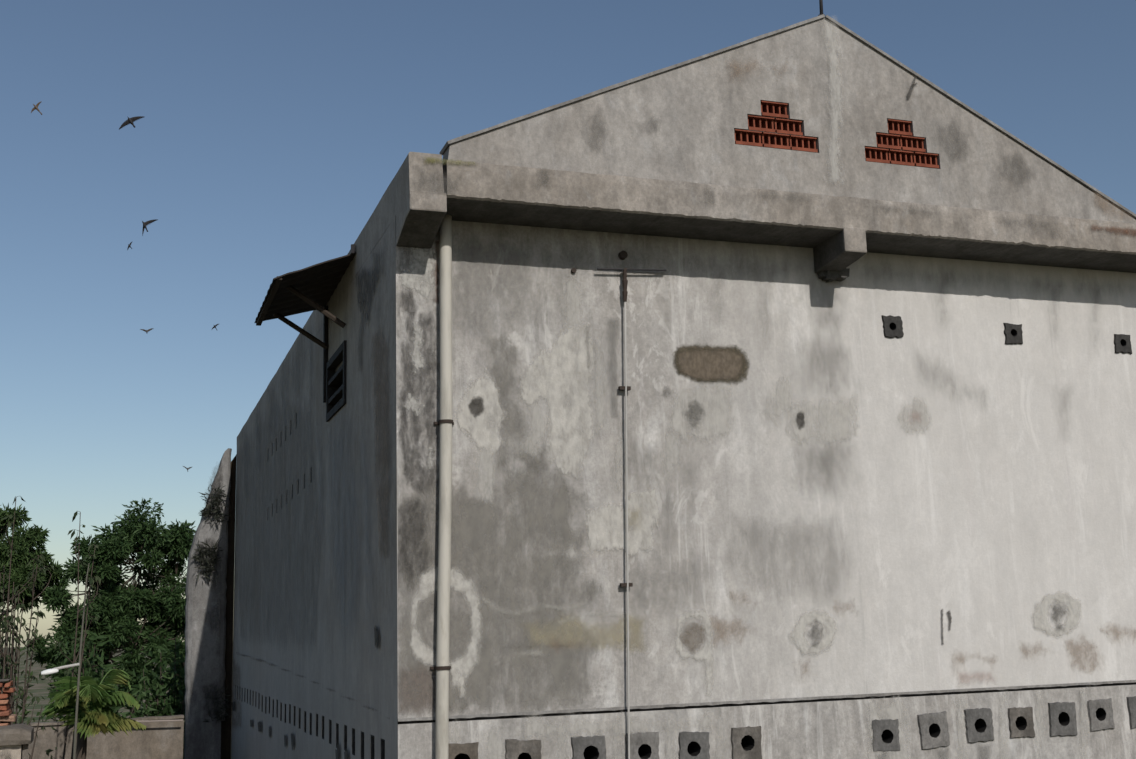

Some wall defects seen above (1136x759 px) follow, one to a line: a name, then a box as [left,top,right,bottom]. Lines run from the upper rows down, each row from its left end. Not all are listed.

leakage [398,293,590,712]